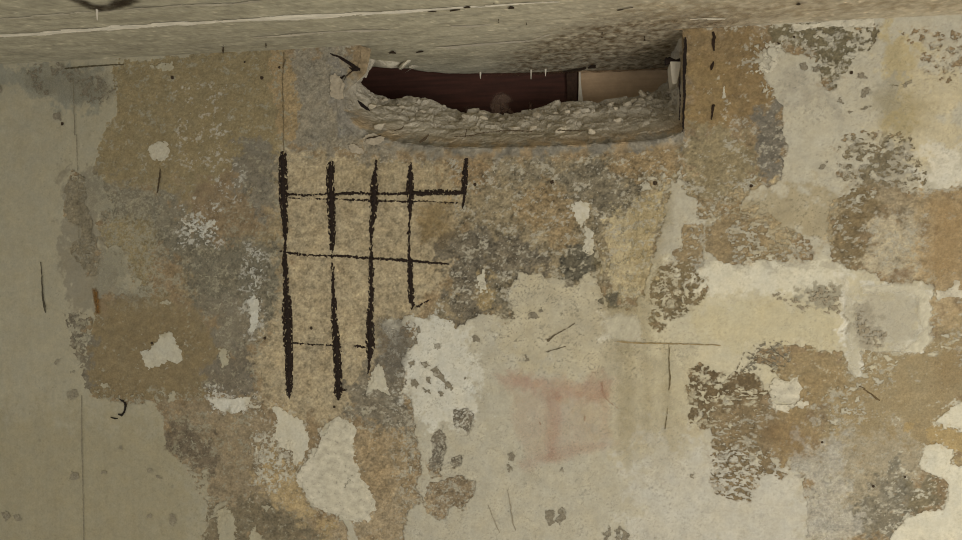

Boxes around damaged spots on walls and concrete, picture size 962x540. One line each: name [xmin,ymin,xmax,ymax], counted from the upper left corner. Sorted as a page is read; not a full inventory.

flaking render [363,131,385,146]
peeling [648,309,666,333]
peeling [685,130,962,540]
peeling [421,361,453,397]
peeling [453,408,474,434]
peeling [426,429,447,479]
peeling [450,455,462,470]
peeling [424,475,476,521]